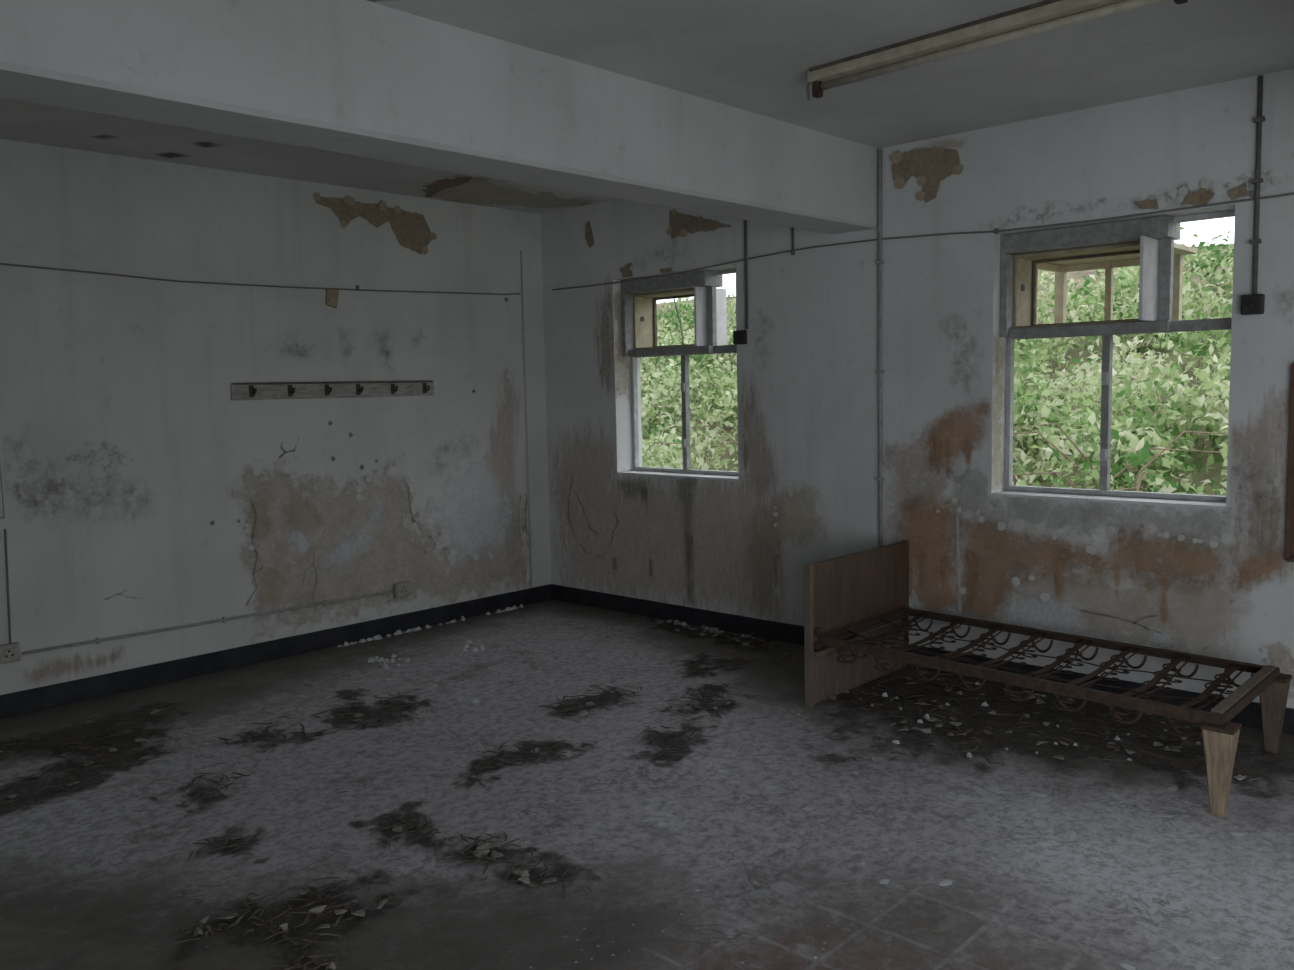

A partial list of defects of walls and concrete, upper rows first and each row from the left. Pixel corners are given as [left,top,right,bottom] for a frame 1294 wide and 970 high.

peeling [889,141,963,203]
peeling [314,192,437,255]
flaking render [910,516,1222,644]